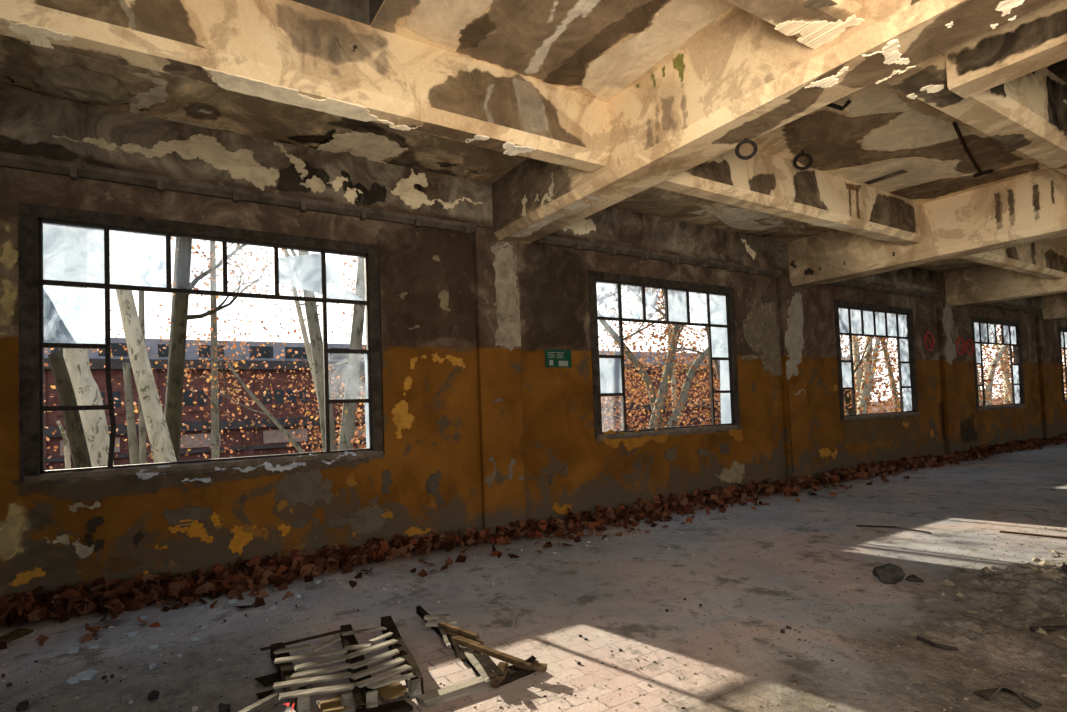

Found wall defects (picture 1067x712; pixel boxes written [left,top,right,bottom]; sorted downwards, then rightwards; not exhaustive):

leakage [371,0,419,32]
peeling [774,0,865,50]
leakage [429,0,670,147]
peeling [52,134,280,191]
peeling [203,67,421,164]
peeling [273,142,363,204]
peeling [391,169,483,210]
leakage [409,123,506,153]
leakage [686,160,733,186]
leakage [712,0,1056,246]
leakage [687,206,784,237]
peeling [491,242,521,351]